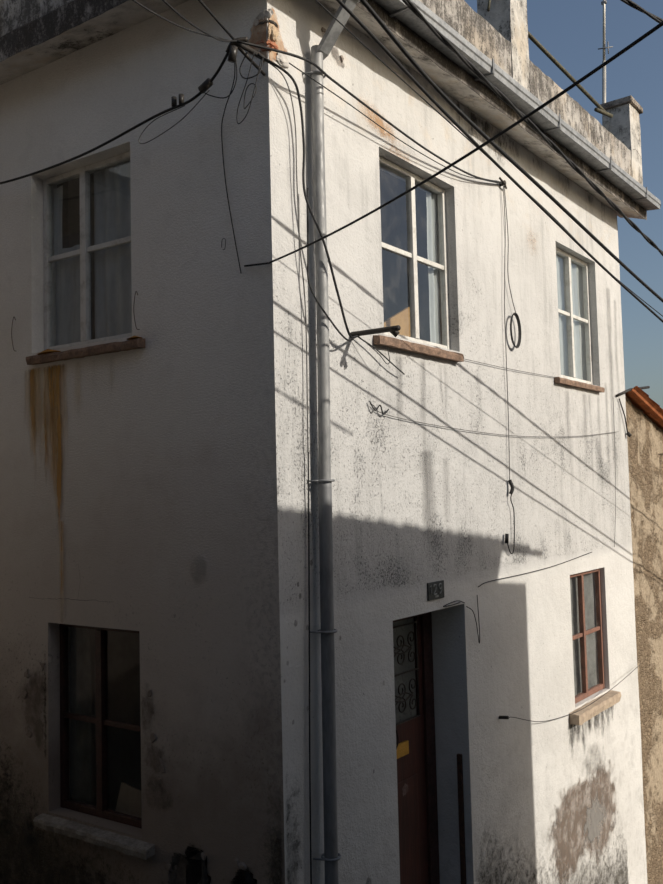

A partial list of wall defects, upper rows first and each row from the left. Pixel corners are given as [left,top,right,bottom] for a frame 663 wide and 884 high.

spalling [248,8,289,67]
corrosion [30,366,62,520]
mould [479,849,628,884]